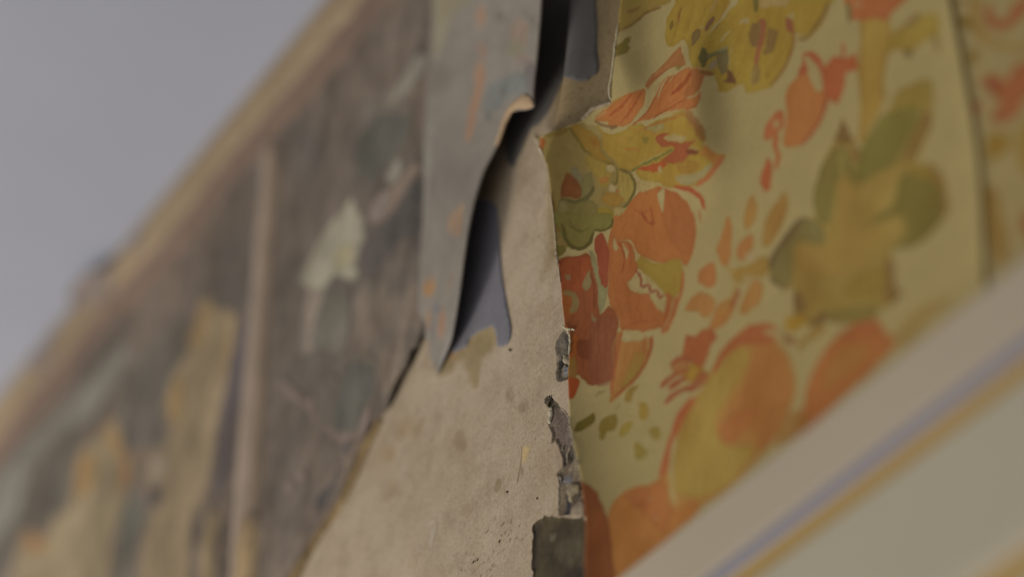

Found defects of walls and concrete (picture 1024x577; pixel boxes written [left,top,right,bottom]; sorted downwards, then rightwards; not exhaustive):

peeling [418,0,543,375]
peeling [297,287,325,359]
flaking render [555,329,569,382]
peeling [531,395,586,577]